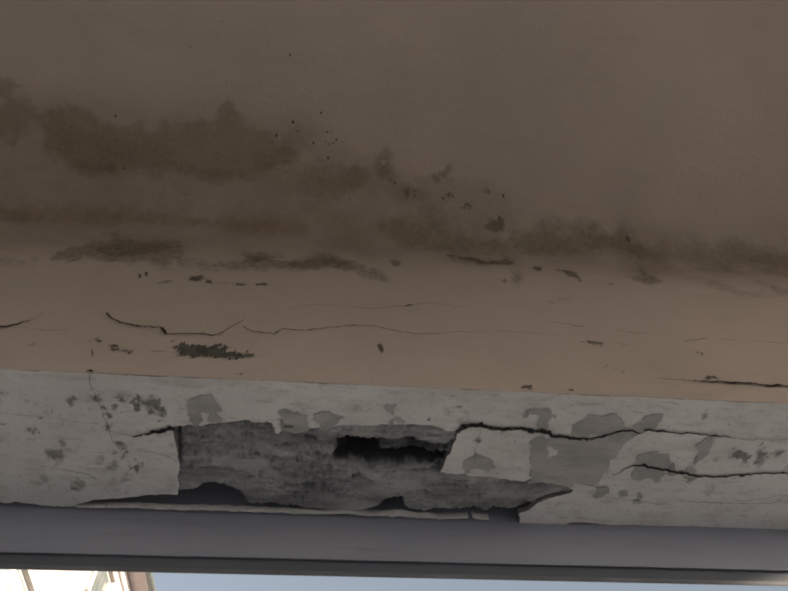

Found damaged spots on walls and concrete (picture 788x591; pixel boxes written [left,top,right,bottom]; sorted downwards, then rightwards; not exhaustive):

crack [106,303,476,336]
crack [661,378,788,387]
spalling [174,395,663,511]
crack [455,422,785,462]
peeling [631,434,718,483]
crack [613,464,788,478]
peeling [730,443,783,464]